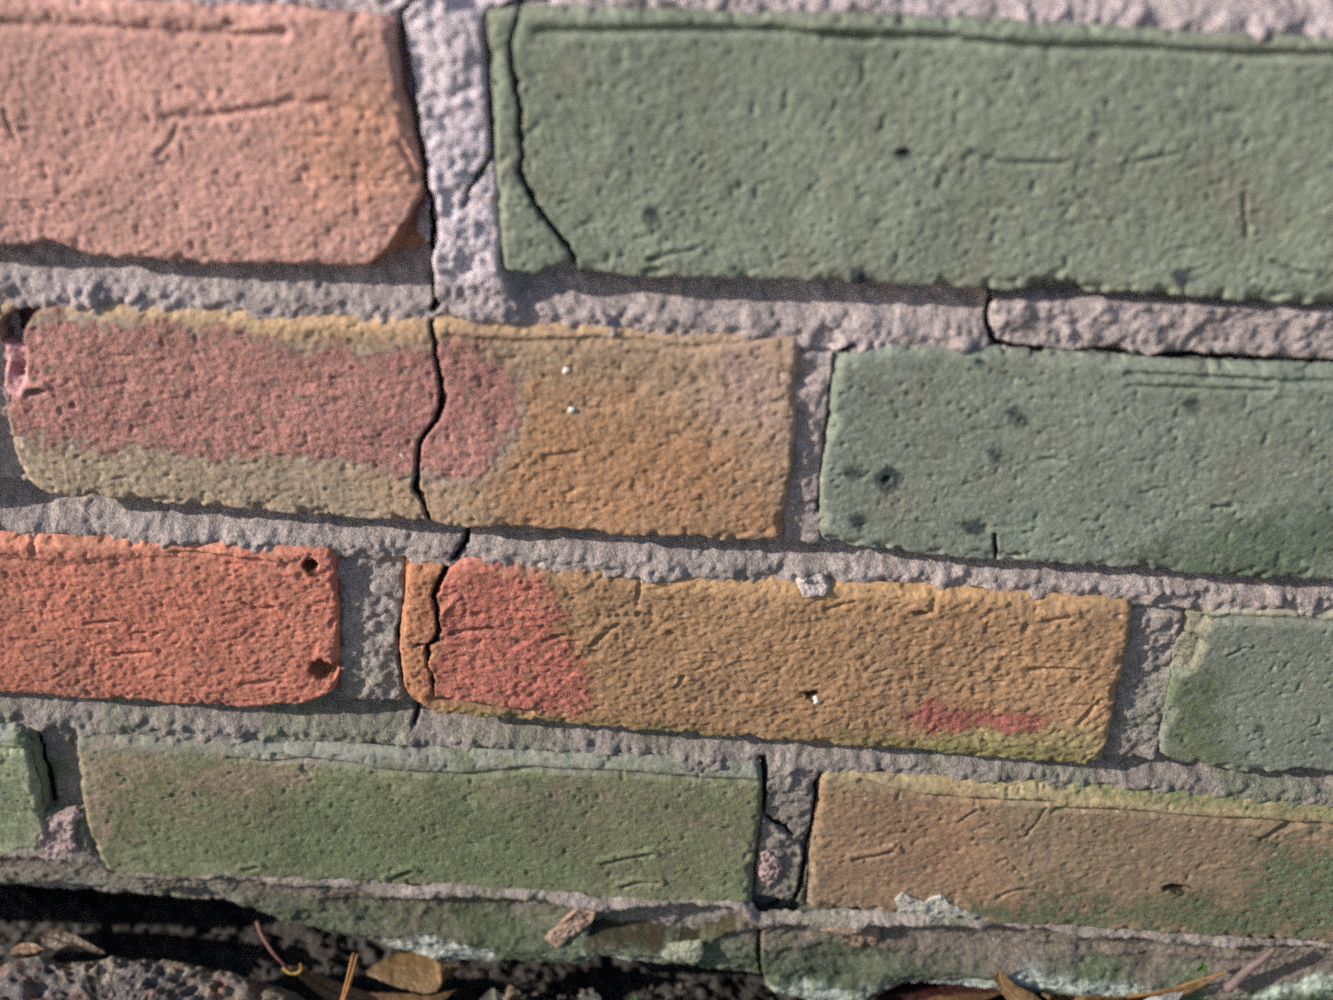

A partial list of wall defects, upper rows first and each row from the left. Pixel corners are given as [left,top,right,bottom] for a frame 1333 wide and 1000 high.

crack [400,0,577,520]
crack [984,292,1043,351]
crack [1081,347,1332,364]
crack [397,527,469,724]
crack [757,755,821,980]
spalling [1161,884,1189,895]
spalling [544,909,746,963]
peeling [820,925,881,947]